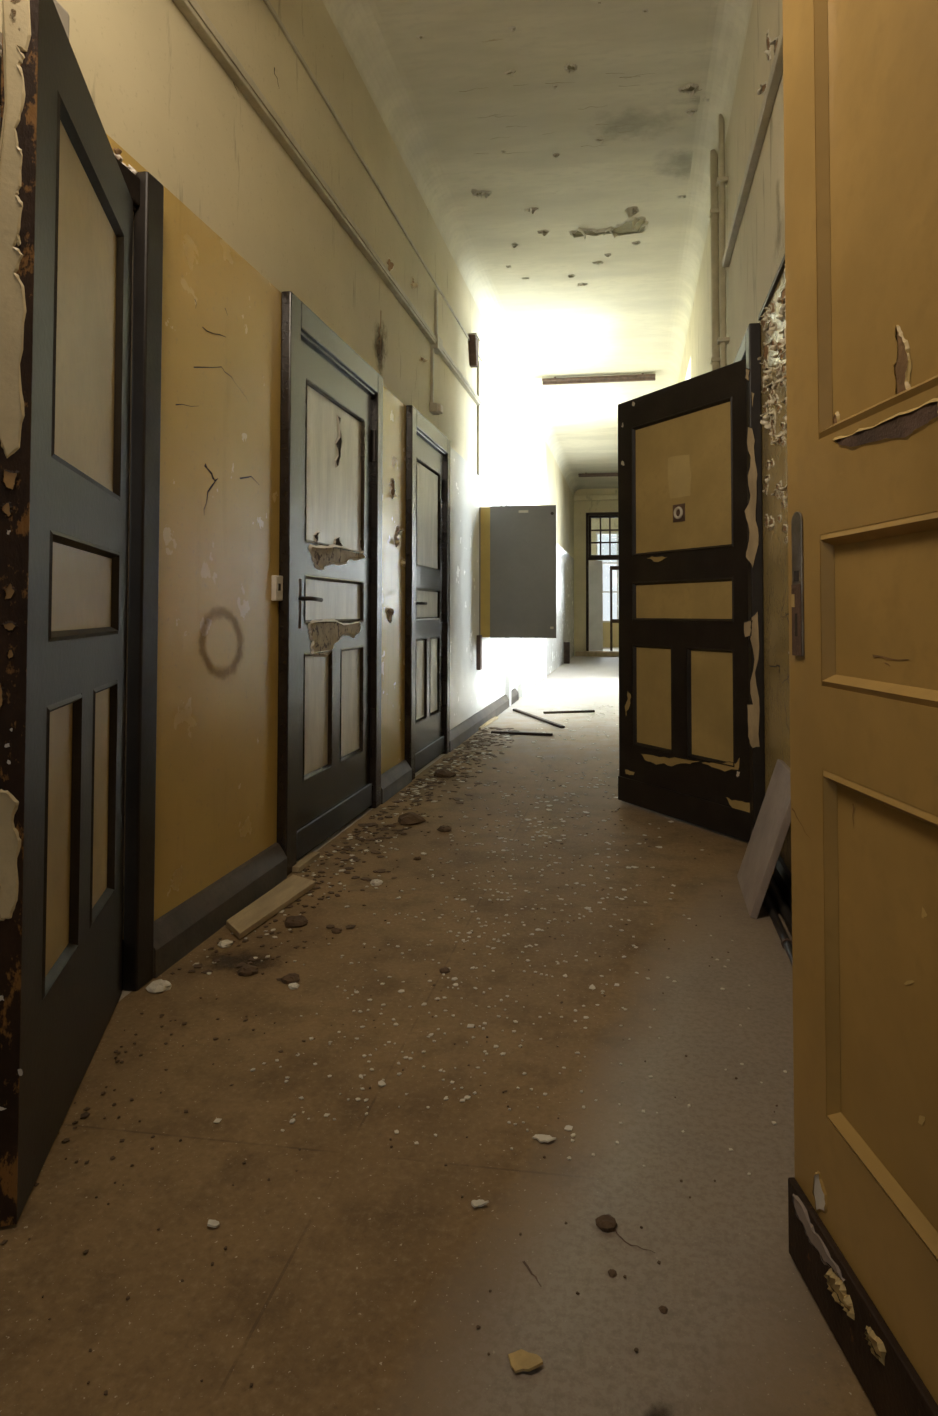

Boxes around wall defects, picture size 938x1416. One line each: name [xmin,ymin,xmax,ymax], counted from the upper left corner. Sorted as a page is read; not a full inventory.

peeling [569,206,649,265]
peeling [894,331,912,394]
peeling [746,264,788,543]